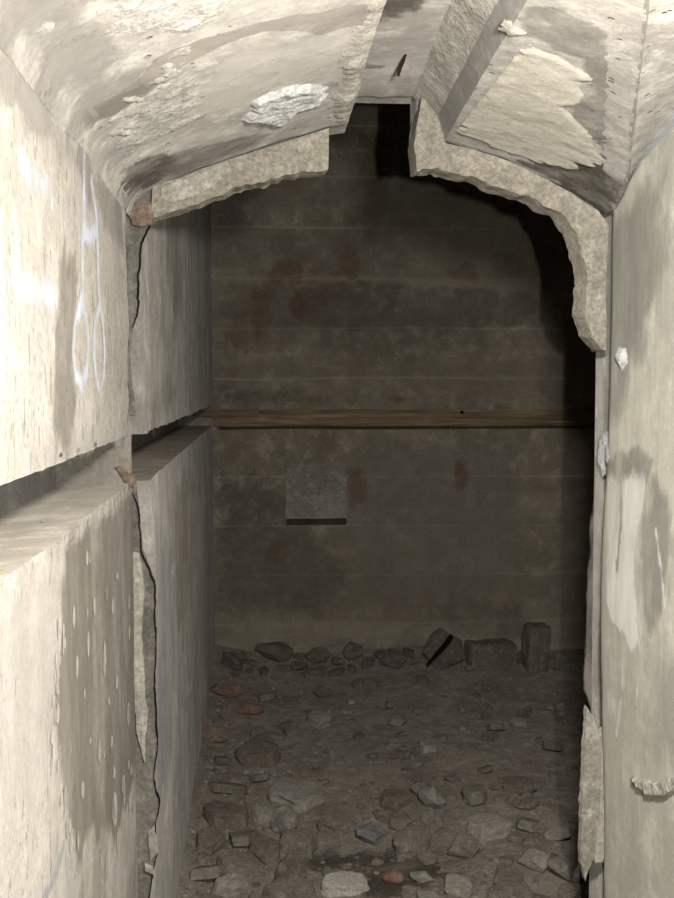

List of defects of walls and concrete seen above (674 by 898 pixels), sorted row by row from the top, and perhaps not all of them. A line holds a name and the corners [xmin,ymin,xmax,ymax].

spalling [241,0,387,128]
crack [125,200,154,347]
leakage [59,500,136,857]
crack [115,466,160,898]
flaking render [631,775,674,799]